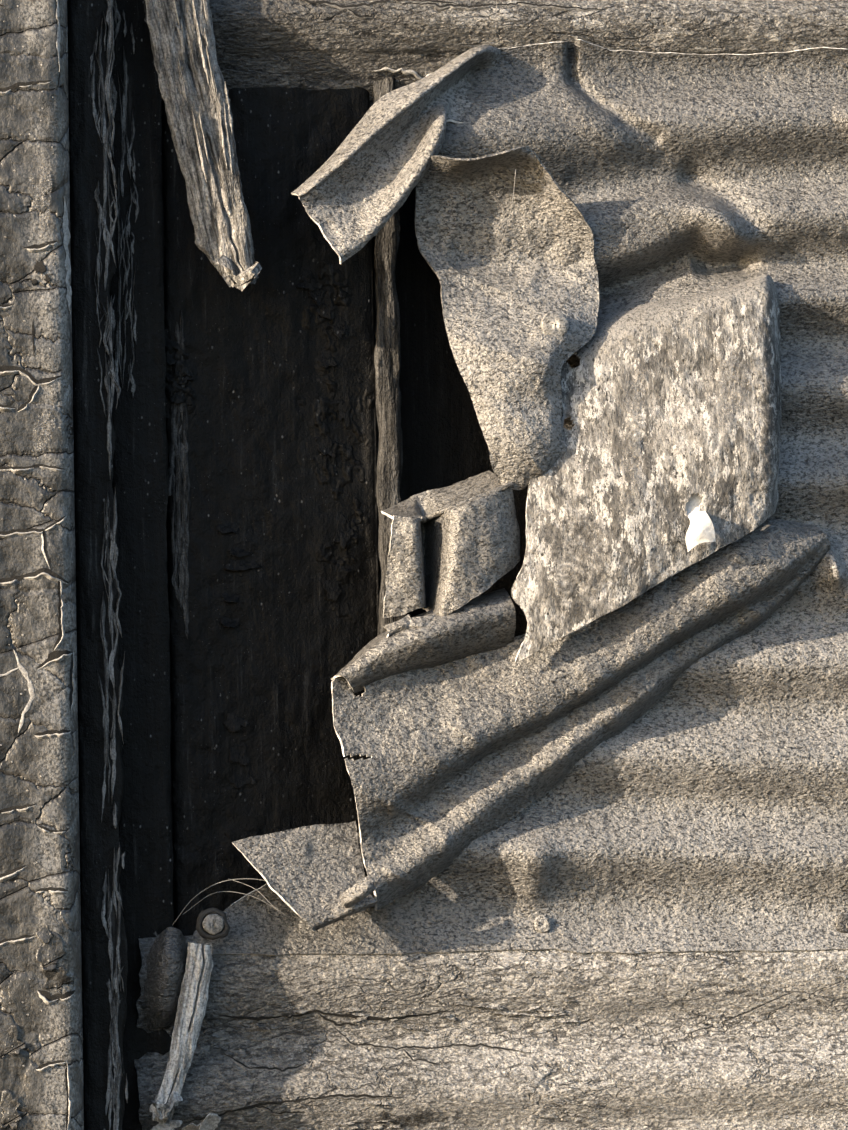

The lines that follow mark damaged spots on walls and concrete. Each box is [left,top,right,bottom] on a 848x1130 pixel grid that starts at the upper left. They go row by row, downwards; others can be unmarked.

peeling [372,67,432,80]
crack [0,304,62,412]
crack [0,464,65,474]
crack [0,516,76,739]
crack [0,804,66,834]
crack [0,865,68,895]
crack [37,990,75,1005]
peeling [343,1008,368,1022]
peeling [385,1010,426,1031]
peeling [437,1000,578,1023]
crack [36,1060,72,1130]
peeling [328,1120,401,1130]